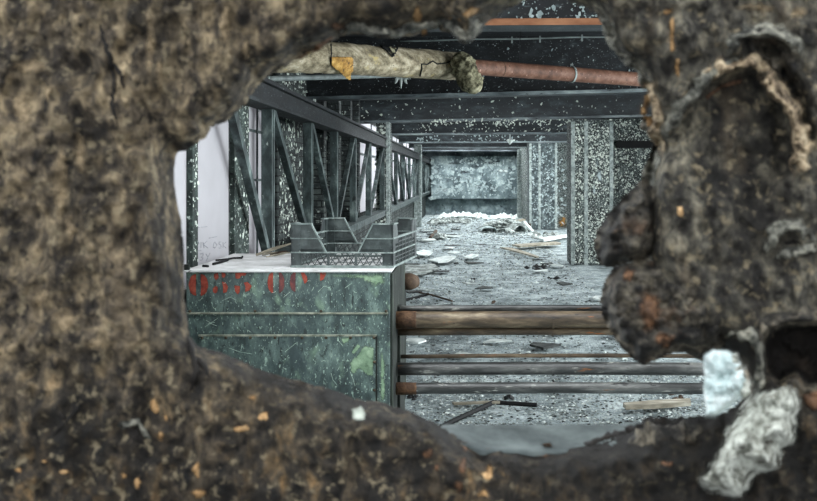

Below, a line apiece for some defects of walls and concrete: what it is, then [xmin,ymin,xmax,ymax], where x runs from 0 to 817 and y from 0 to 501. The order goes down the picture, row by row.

crack [99,24,125,131]
peeling [279,119,303,245]
peeling [374,90,651,264]
spalling [584,416,703,449]